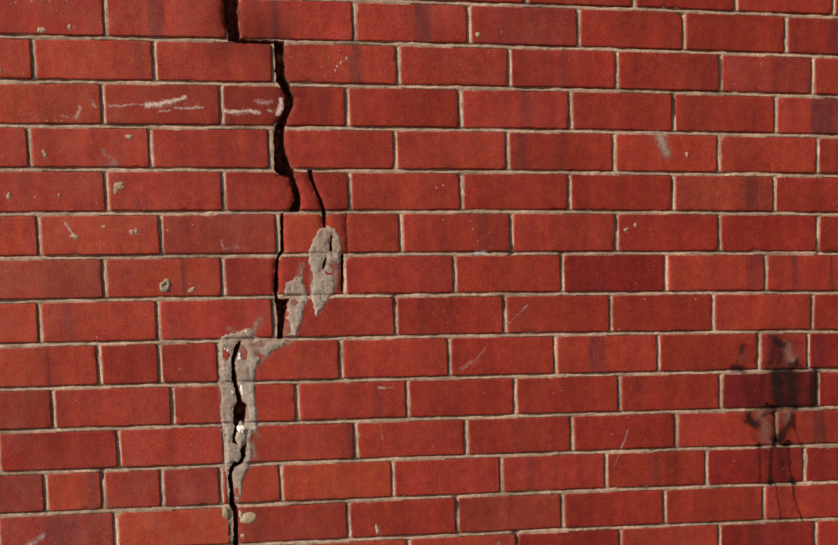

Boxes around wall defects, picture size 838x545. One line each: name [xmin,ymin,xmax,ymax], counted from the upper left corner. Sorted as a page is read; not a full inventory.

crack [223,0,348,340]
crack [228,340,247,545]
water stain [771,368,799,410]
water stain [810,368,818,405]